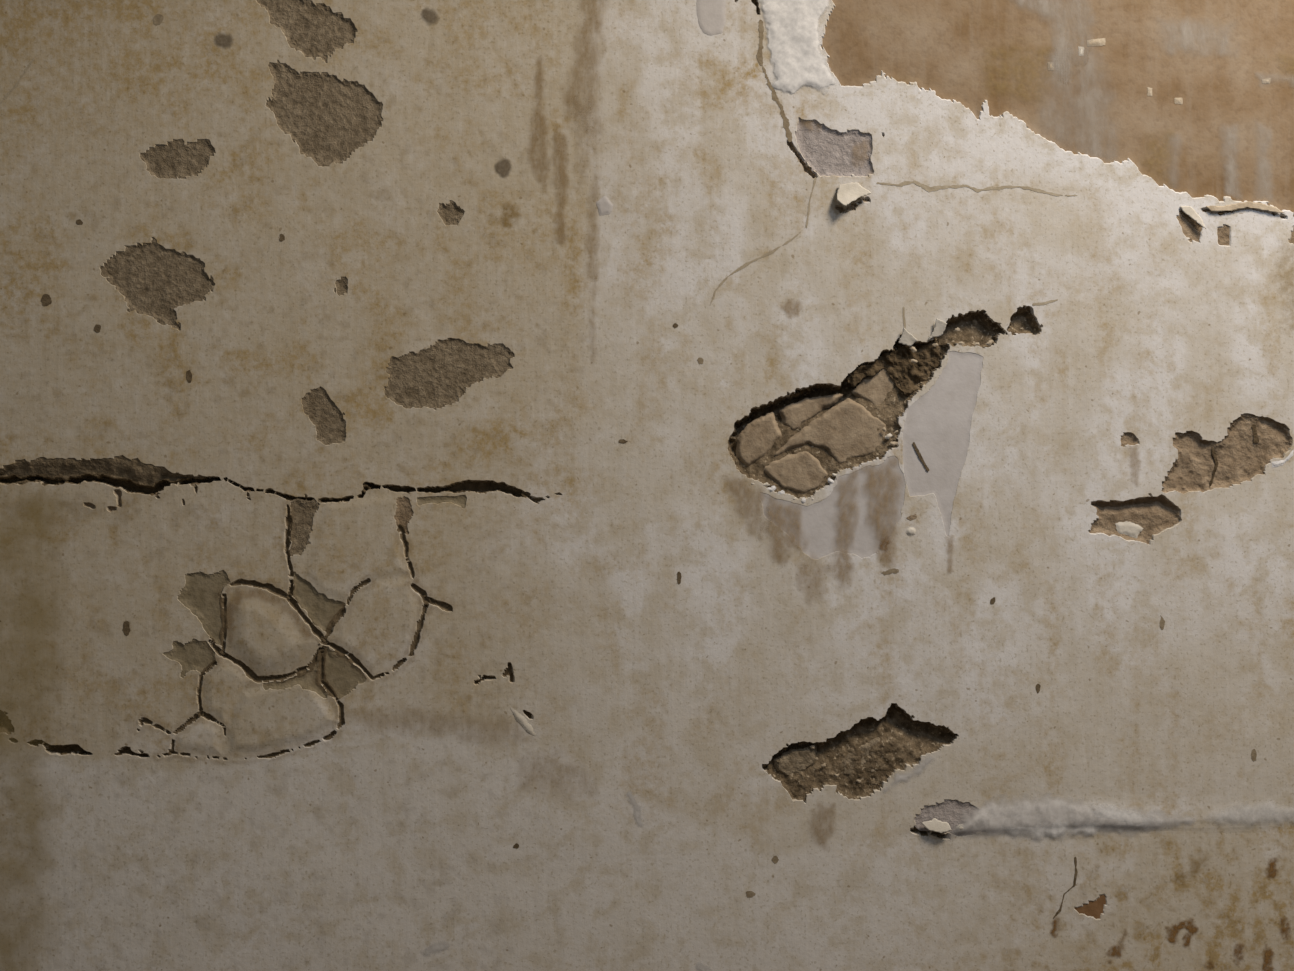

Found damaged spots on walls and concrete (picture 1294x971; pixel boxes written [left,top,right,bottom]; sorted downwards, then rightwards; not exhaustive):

spalling [257,0,383,167]
crack [711,0,817,303]
crack [877,180,1077,197]
peeling [760,0,1294,246]
spalling [100,238,215,331]
spalling [384,338,514,409]
spalling [728,299,1058,559]
spalling [1089,413,1294,544]
crack [0,455,561,760]
spalling [762,703,958,801]
rust [1168,921,1198,946]
rust [1263,949,1273,971]